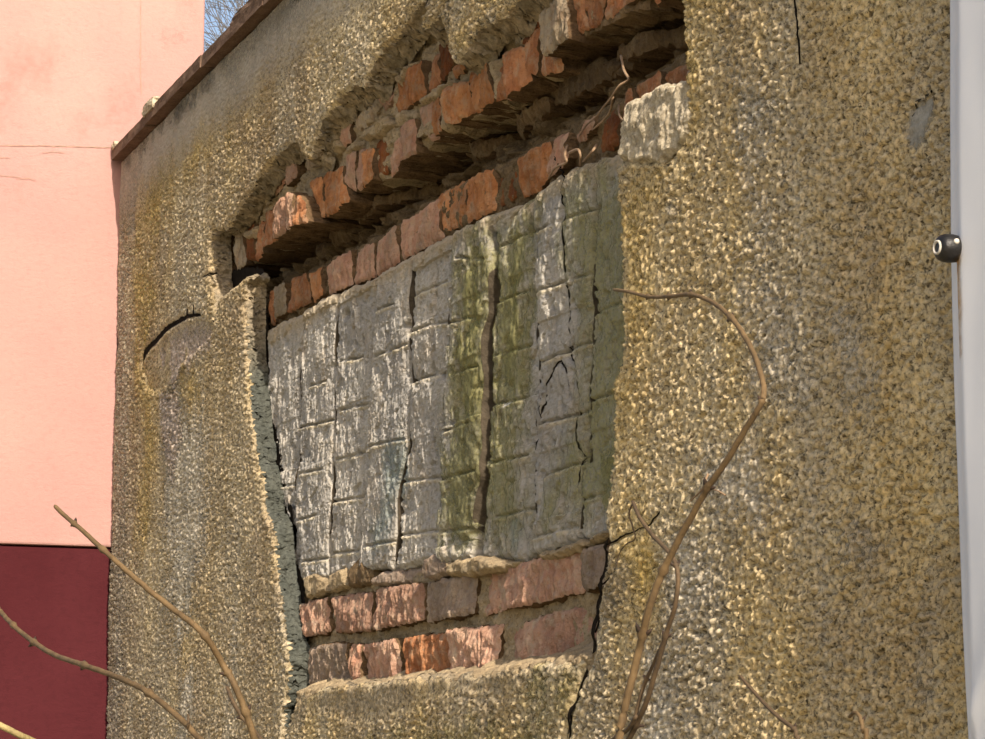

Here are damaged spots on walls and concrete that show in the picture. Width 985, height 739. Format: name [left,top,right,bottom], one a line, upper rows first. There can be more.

crack [793,0,801,64]
crack [143,305,215,363]
crack [203,266,268,365]
crack [270,362,303,524]
spalling [231,0,691,725]
crack [473,267,501,533]
crack [295,563,305,603]
crack [567,511,660,739]